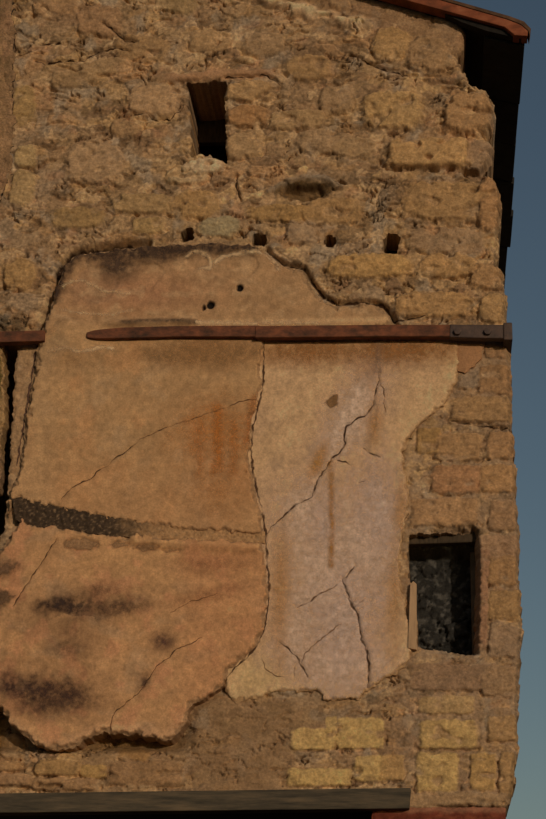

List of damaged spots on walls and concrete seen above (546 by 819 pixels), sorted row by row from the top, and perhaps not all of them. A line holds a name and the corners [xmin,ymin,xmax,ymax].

crack [61,342,386,688]
crack [13,541,56,606]
crack [110,637,202,729]